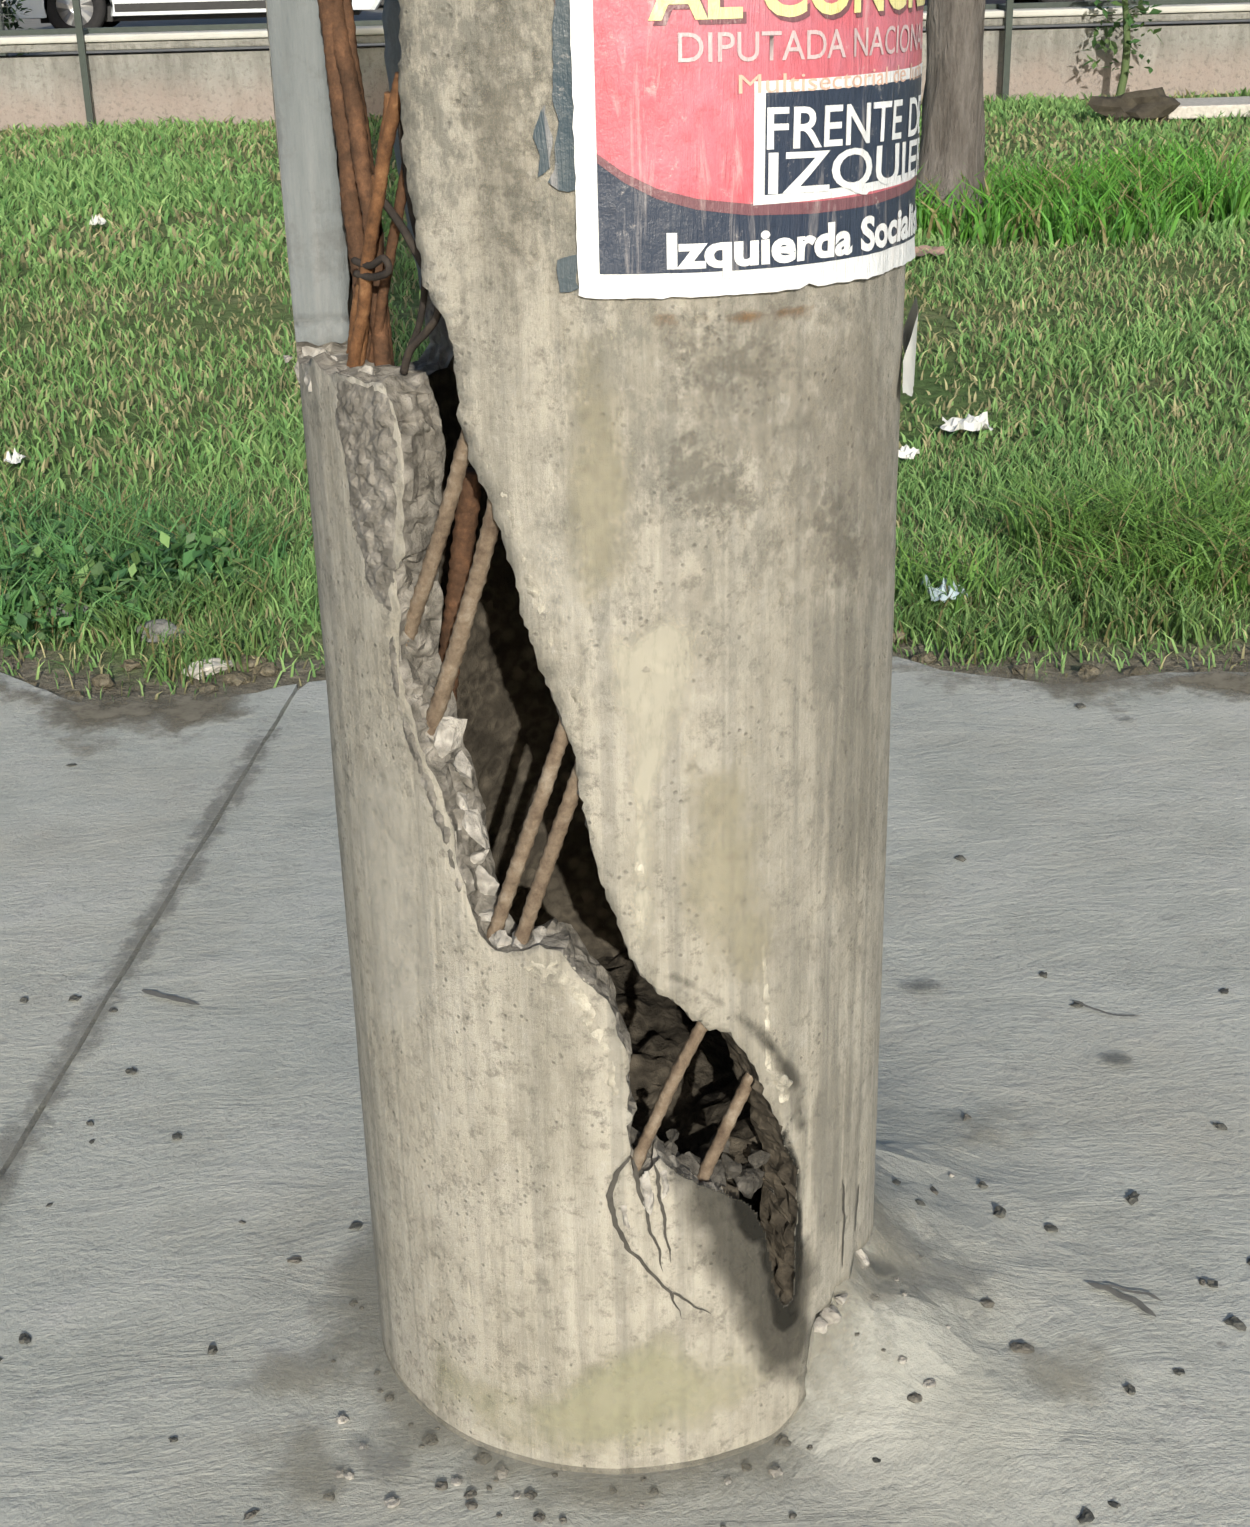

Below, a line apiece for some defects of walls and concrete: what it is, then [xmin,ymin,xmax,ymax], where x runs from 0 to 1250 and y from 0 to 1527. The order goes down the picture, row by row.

spalling [283,346,402,612]
spalling [389,636,619,1096]
peeling [617,624,690,938]
peeling [761,937,793,1103]
crack [606,1156,711,1319]
spalling [621,1126,774,1229]